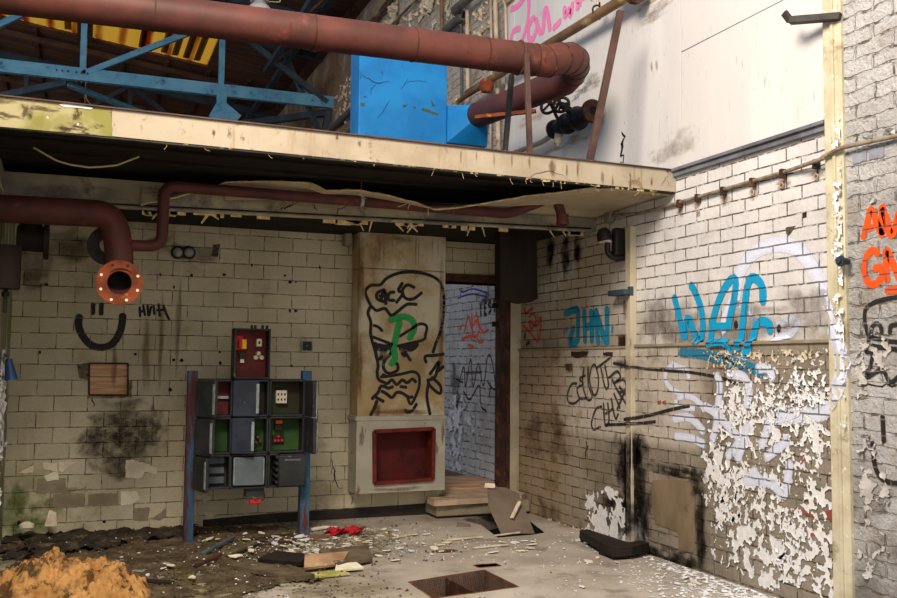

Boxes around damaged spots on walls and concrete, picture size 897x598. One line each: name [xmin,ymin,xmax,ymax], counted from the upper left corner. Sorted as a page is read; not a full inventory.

peeling [382,0,459,30]
peeling [469,0,493,36]
peeling [333,76,366,127]
peeling [619,117,897,598]
peeling [0,349,8,465]
damp [85,418,159,479]
peeling [445,394,486,472]
damp [616,435,648,482]
peeling [544,486,626,541]
damp [598,469,706,569]